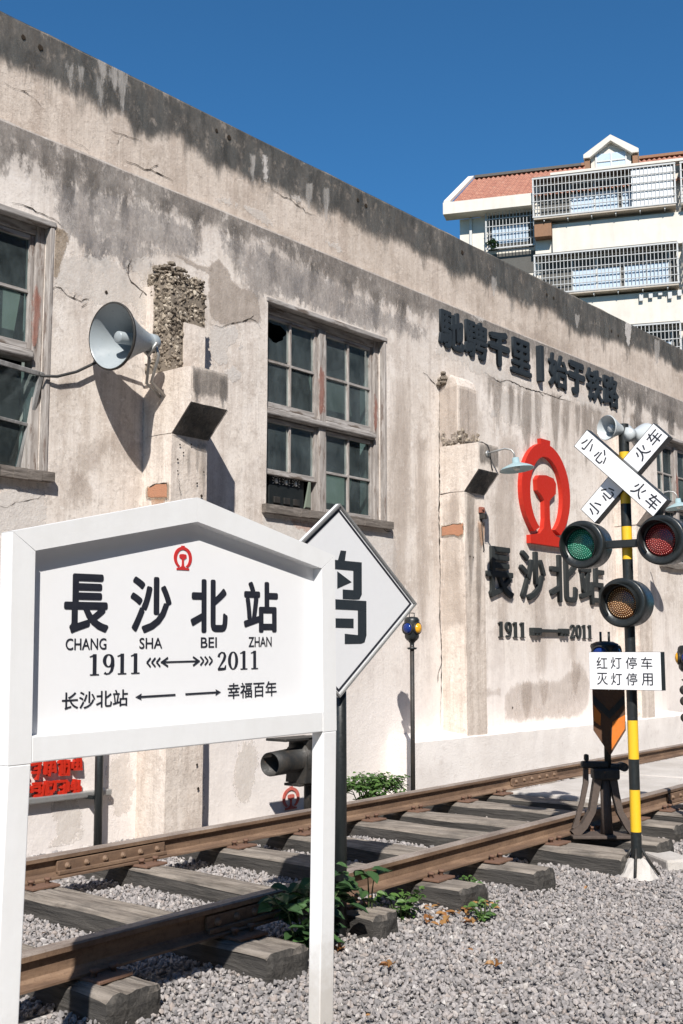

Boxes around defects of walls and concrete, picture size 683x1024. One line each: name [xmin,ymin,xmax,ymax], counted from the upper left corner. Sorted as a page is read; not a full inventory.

crack [113,131,172,180]
leakage [0,11,683,441]
crack [490,376,570,402]
flaking render [146,482,169,499]
flaking render [441,522,464,538]